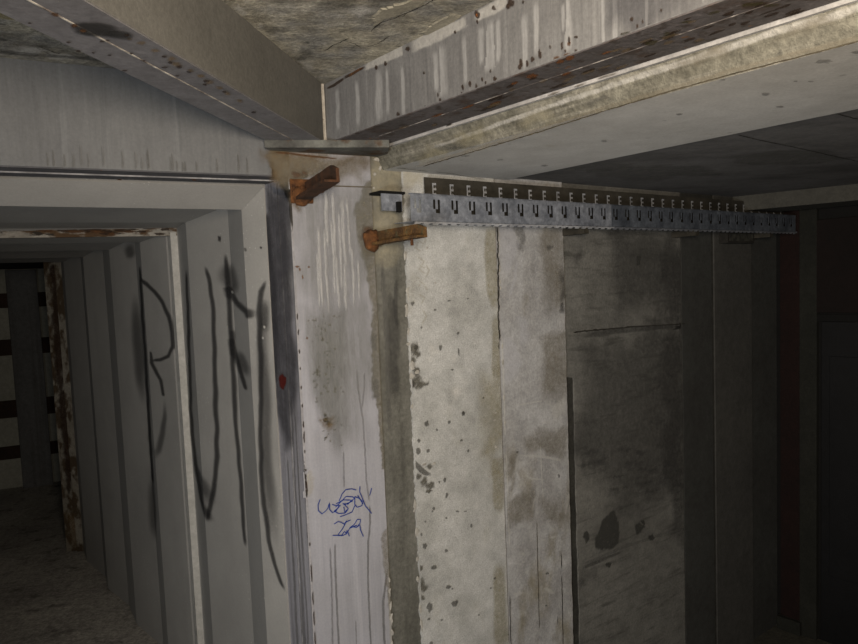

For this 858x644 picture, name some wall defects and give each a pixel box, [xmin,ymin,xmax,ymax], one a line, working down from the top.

crack [327,0,433,50]
rust [640,0,804,45]
rust [518,36,625,96]
rust [50,265,71,493]
damp [583,511,619,567]